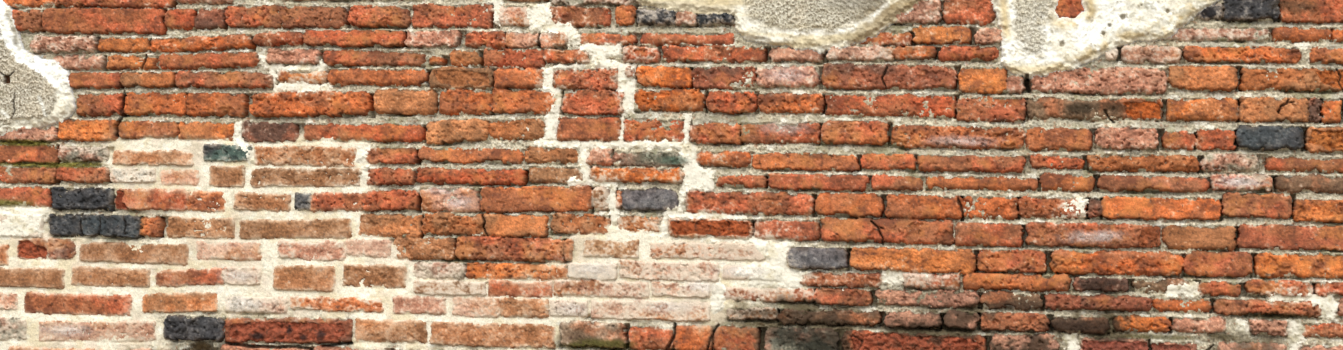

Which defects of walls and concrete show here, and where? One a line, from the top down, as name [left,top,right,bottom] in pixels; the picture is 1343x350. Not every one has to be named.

peeling [0,0,76,142]
peeling [634,0,928,55]
peeling [991,0,1220,80]